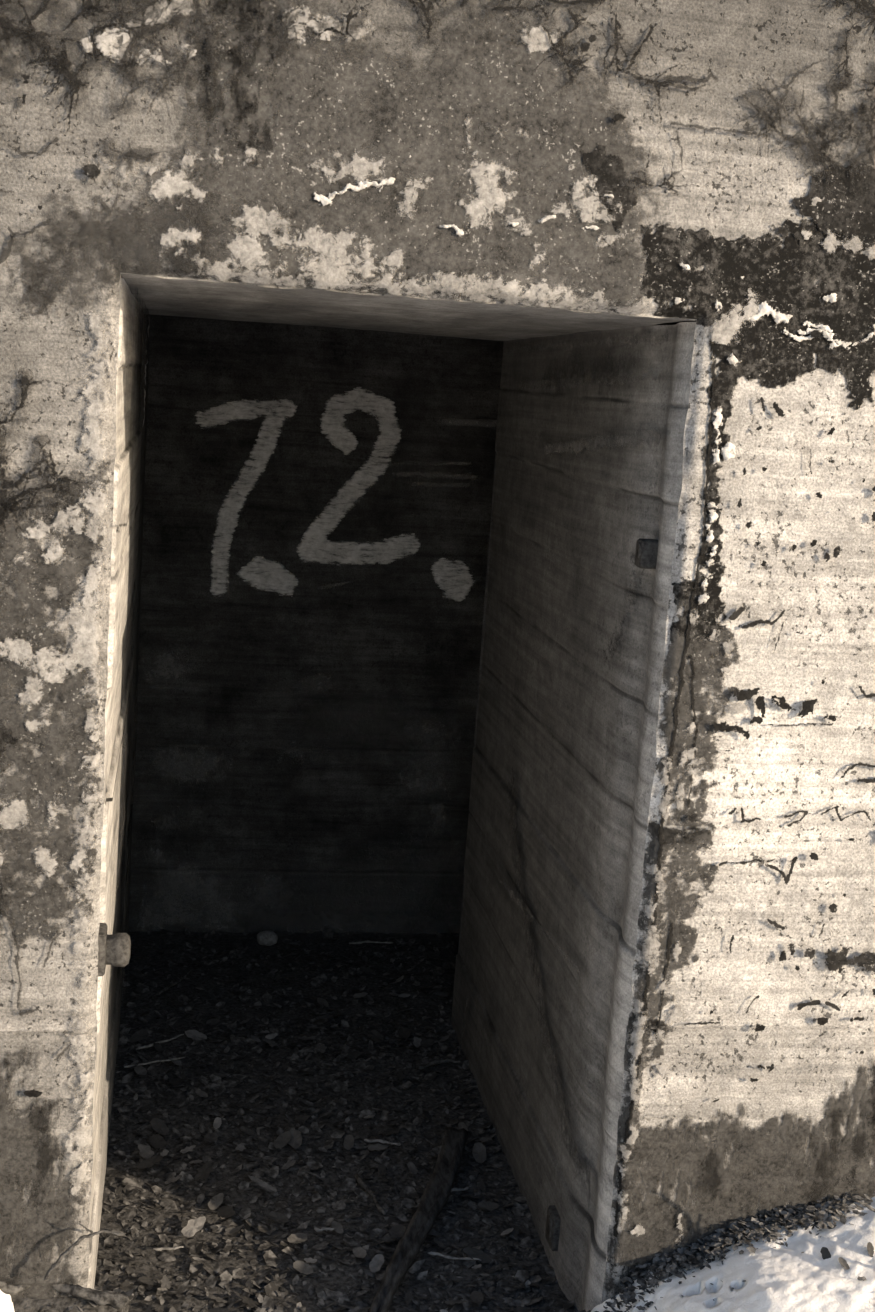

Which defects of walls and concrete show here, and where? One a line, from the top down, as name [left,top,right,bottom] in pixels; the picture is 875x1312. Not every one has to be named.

peeling [80,0,200,66]
peeling [96,147,223,210]
peeling [159,119,649,315]
peeling [711,276,875,366]
water stain [12,0,875,832]
crack [728,607,785,651]
water stain [0,461,111,944]
crack [728,762,875,827]
crack [719,858,794,884]
water stain [624,820,719,1096]
crack [797,990,849,1011]
water stain [604,1064,875,1295]